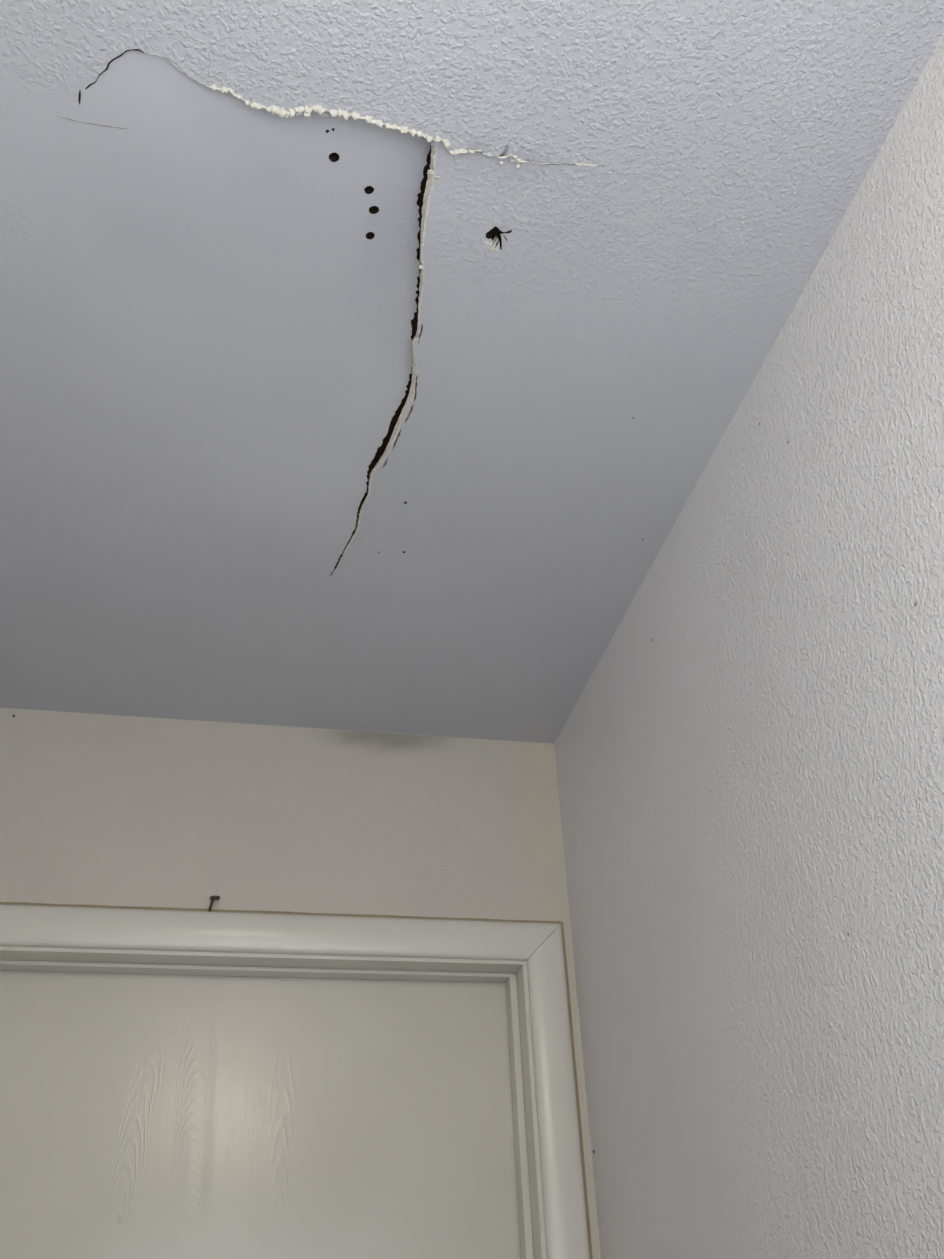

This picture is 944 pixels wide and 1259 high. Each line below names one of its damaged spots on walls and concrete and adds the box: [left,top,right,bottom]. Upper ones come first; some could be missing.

crack [330,140,440,576]